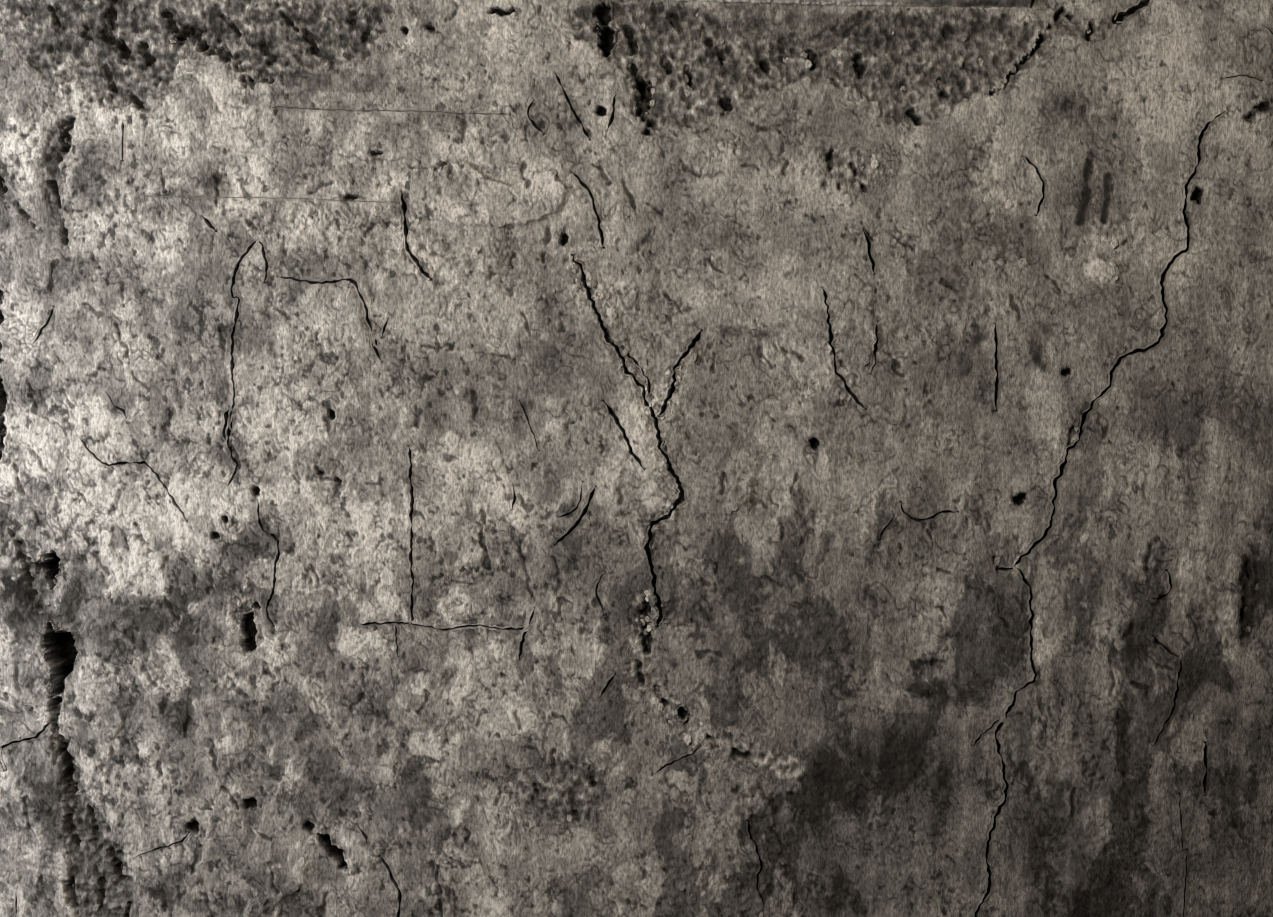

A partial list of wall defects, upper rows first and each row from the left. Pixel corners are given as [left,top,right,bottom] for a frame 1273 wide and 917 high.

flaking render [0,0,439,253]
flaking render [560,0,1122,148]
crack [1114,0,1153,24]
crack [1262,24,1273,37]
flaking render [0,267,13,464]
crack [972,73,1263,917]
flaking render [4,525,138,917]
crack [598,673,616,698]
crack [653,744,701,776]
crack [746,820,766,908]